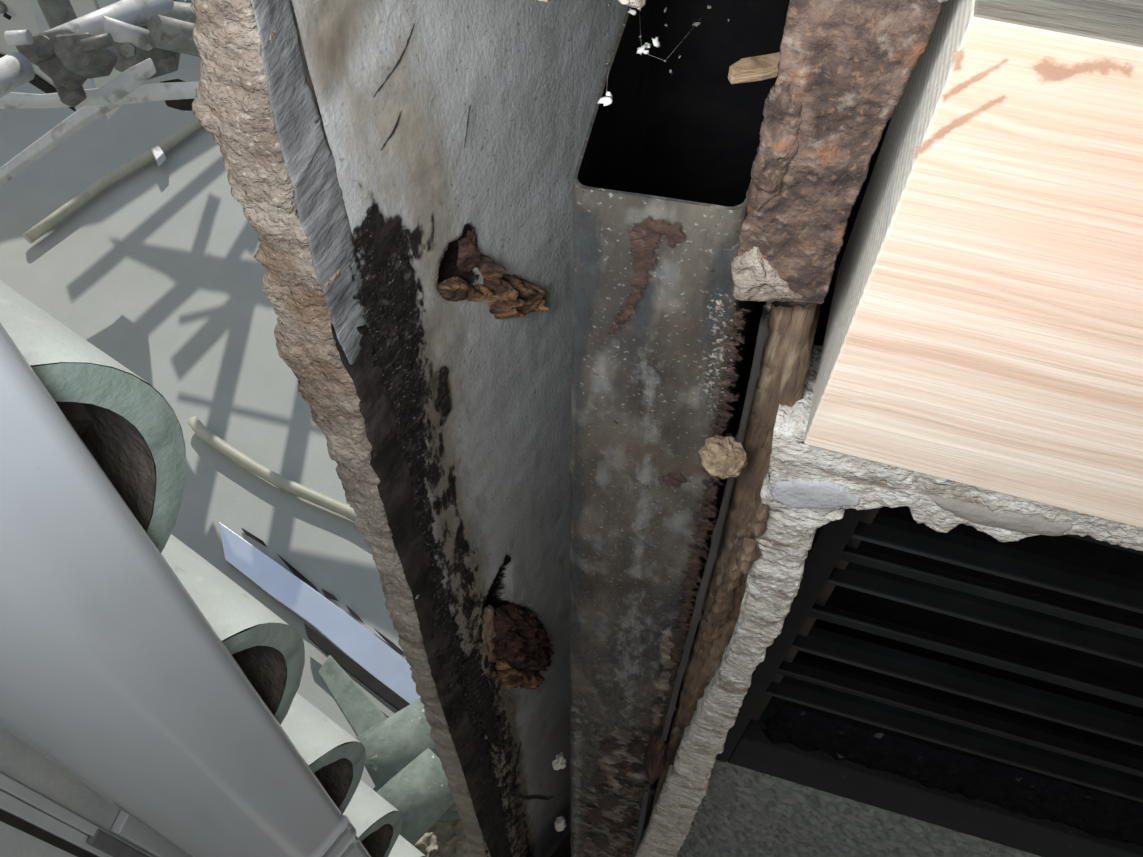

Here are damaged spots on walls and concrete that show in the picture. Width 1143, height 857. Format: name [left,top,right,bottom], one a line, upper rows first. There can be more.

peeling [597,62,613,106]
peeling [608,0,712,74]
corrosion [607,216,685,334]
corrosion [694,291,750,436]
spalling [191,0,491,857]
spalling [735,504,769,574]
corrosion [577,468,723,857]